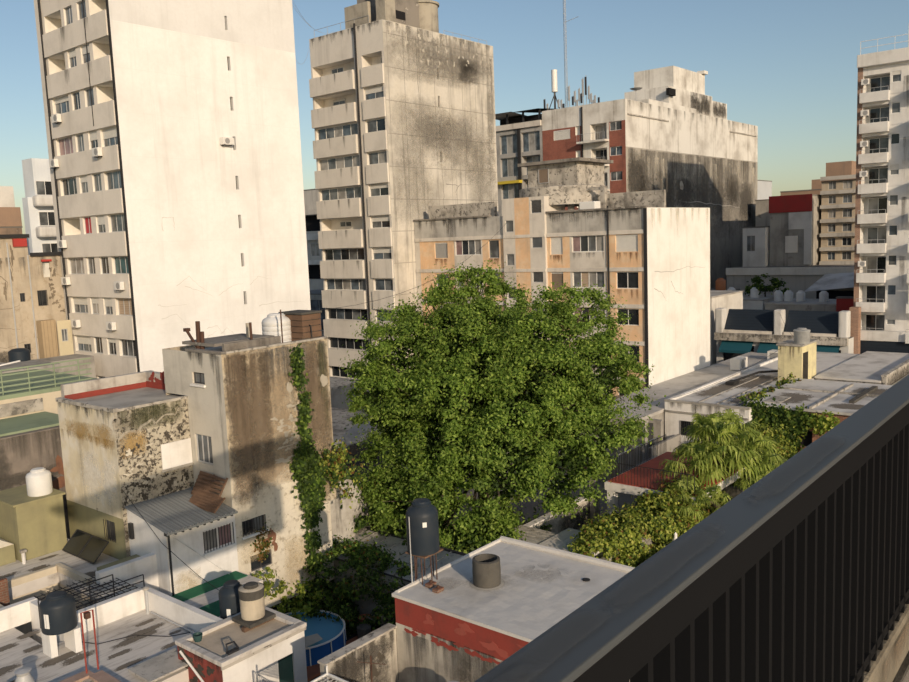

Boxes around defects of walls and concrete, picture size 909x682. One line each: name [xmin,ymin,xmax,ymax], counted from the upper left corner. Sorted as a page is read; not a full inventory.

leakage [629,148,755,216]
flaking render [49,259,65,312]
leakage [216,341,332,501]
flaking render [120,437,189,506]
leakage [332,631,393,682]
peeling [404,614,509,665]